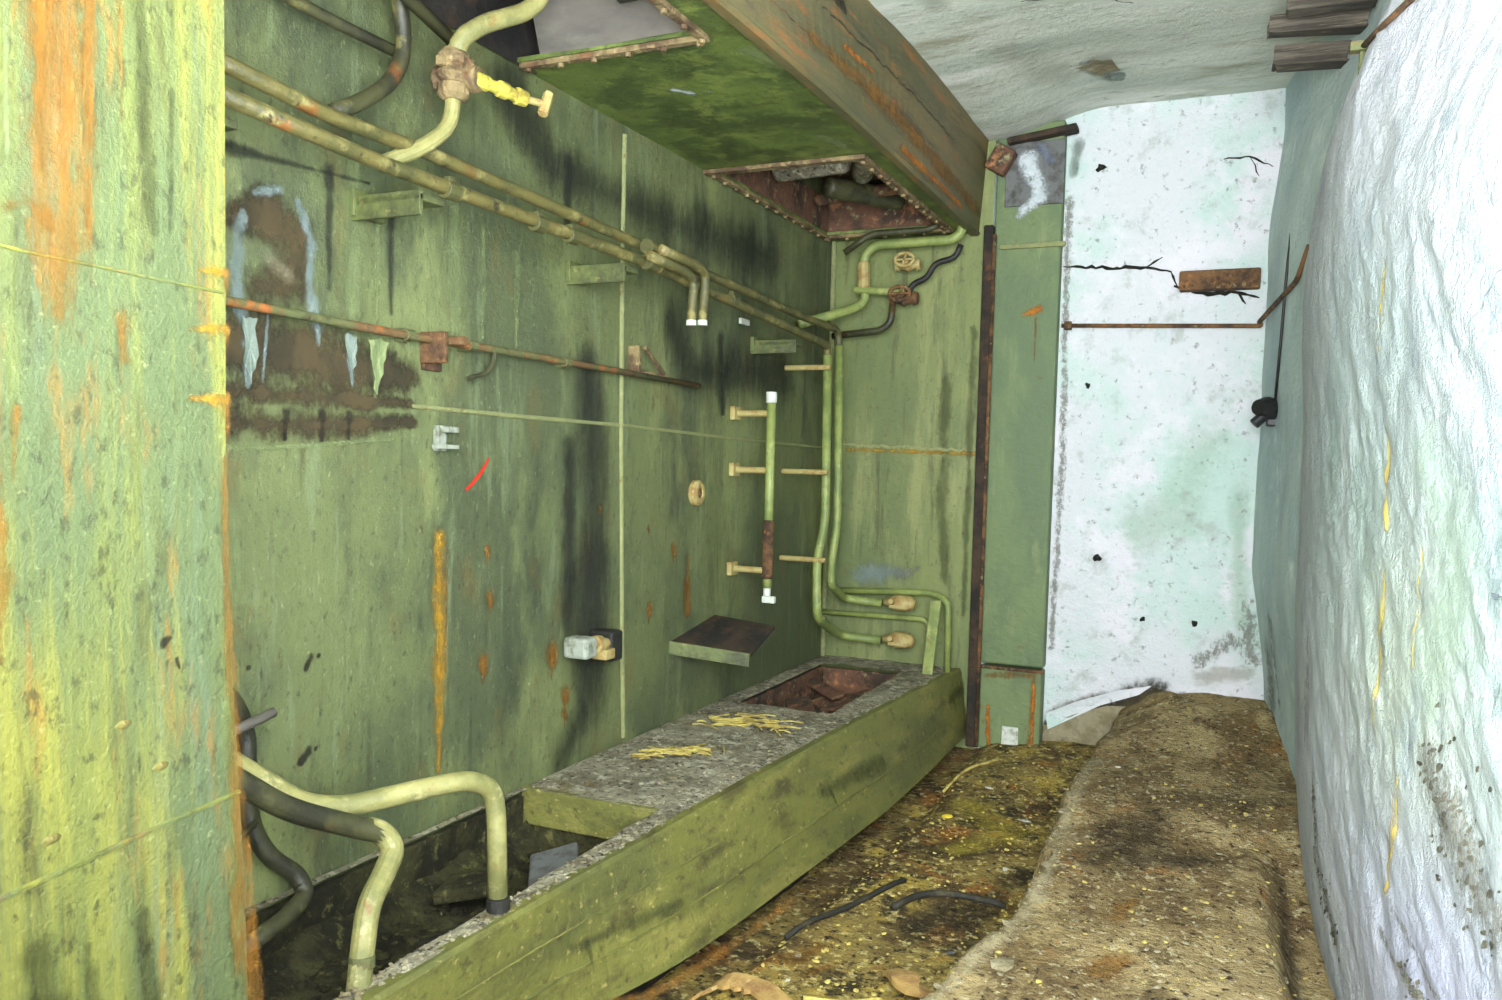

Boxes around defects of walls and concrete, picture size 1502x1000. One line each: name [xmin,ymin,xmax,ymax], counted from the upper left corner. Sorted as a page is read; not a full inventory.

corrosion [810,34,979,213]
water stain [225,142,418,451]
corrosion [433,531,448,772]
mould [1417,736,1502,957]